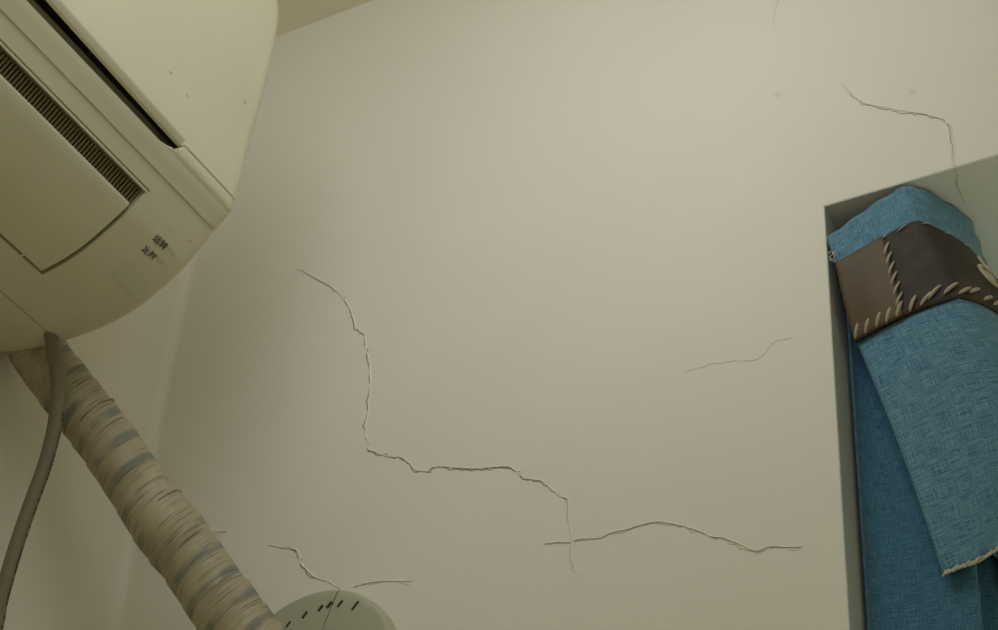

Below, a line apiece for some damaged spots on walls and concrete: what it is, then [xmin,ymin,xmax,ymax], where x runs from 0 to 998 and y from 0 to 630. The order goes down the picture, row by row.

crack [842,83,966,206]
crack [297,269,802,574]